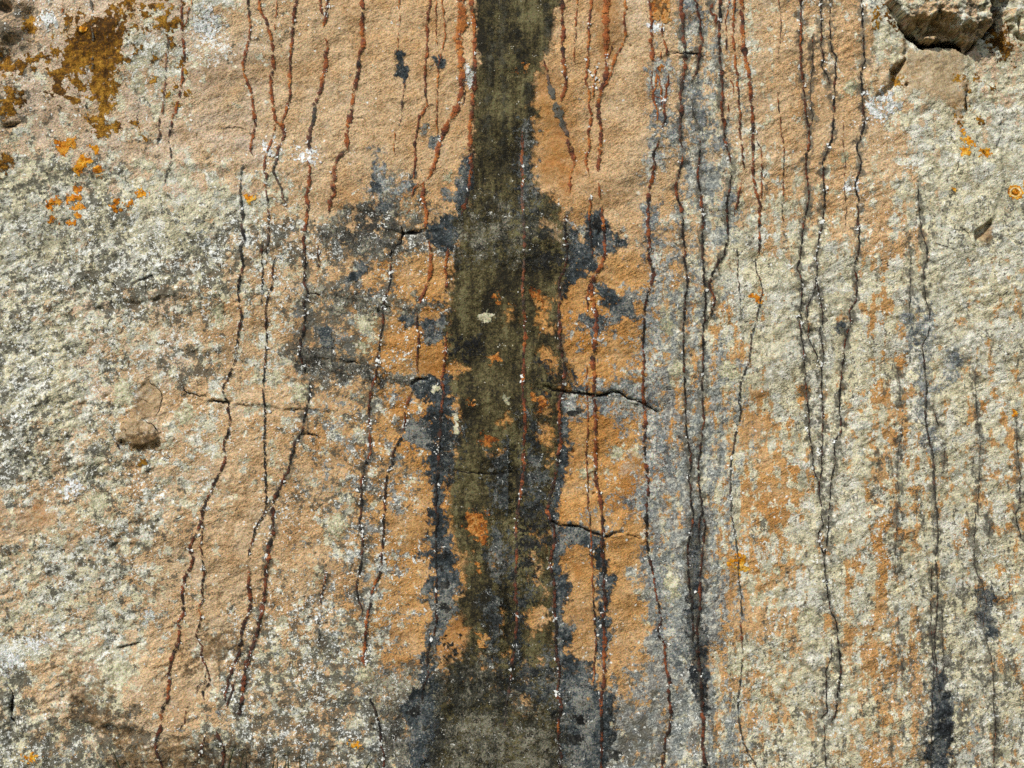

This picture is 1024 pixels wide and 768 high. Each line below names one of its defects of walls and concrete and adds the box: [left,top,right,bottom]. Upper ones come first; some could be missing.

corrosion [327,0,366,213]
corrosion [407,0,478,228]
crack [137,383,247,432]
corrosion [415,242,449,371]
water stain [179,0,740,768]
corrosion [544,0,628,768]
crack [547,388,671,414]
crack [552,521,643,538]